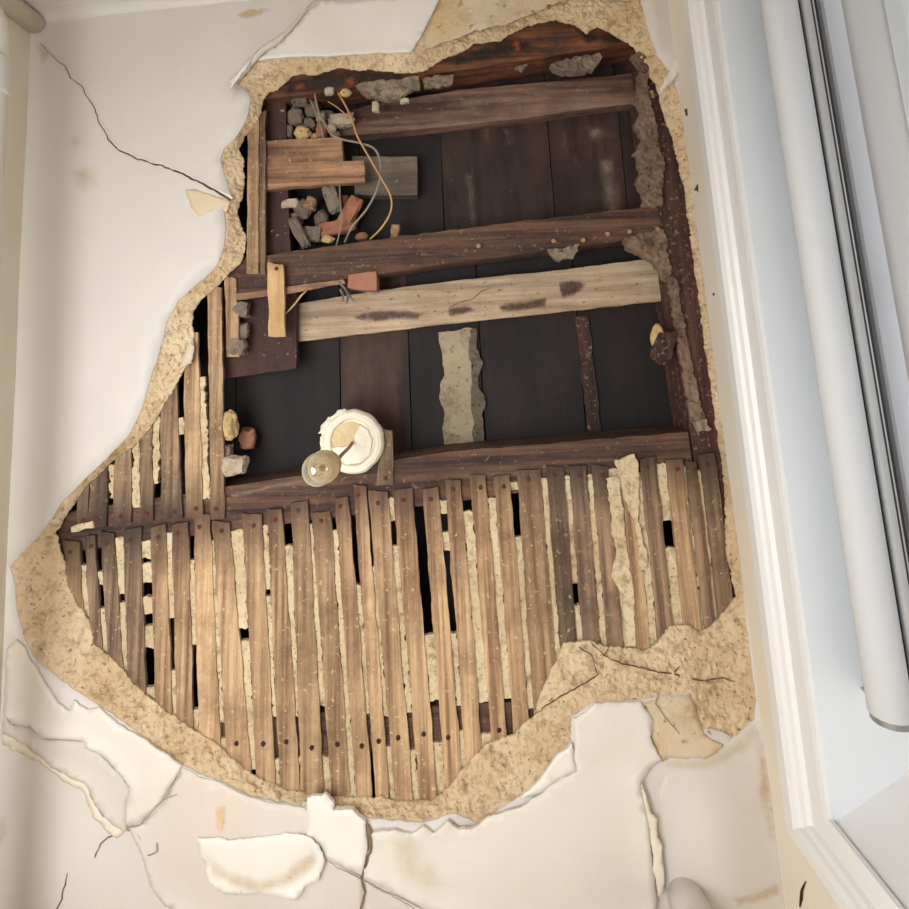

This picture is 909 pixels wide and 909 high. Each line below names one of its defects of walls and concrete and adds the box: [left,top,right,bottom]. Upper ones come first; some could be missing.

crack [41,43,232,201]
spalling [1,0,756,875]
crack [530,642,735,734]
crack [94,772,181,858]
peeling [129,767,365,909]
crack [326,824,421,909]
peeling [362,701,665,909]